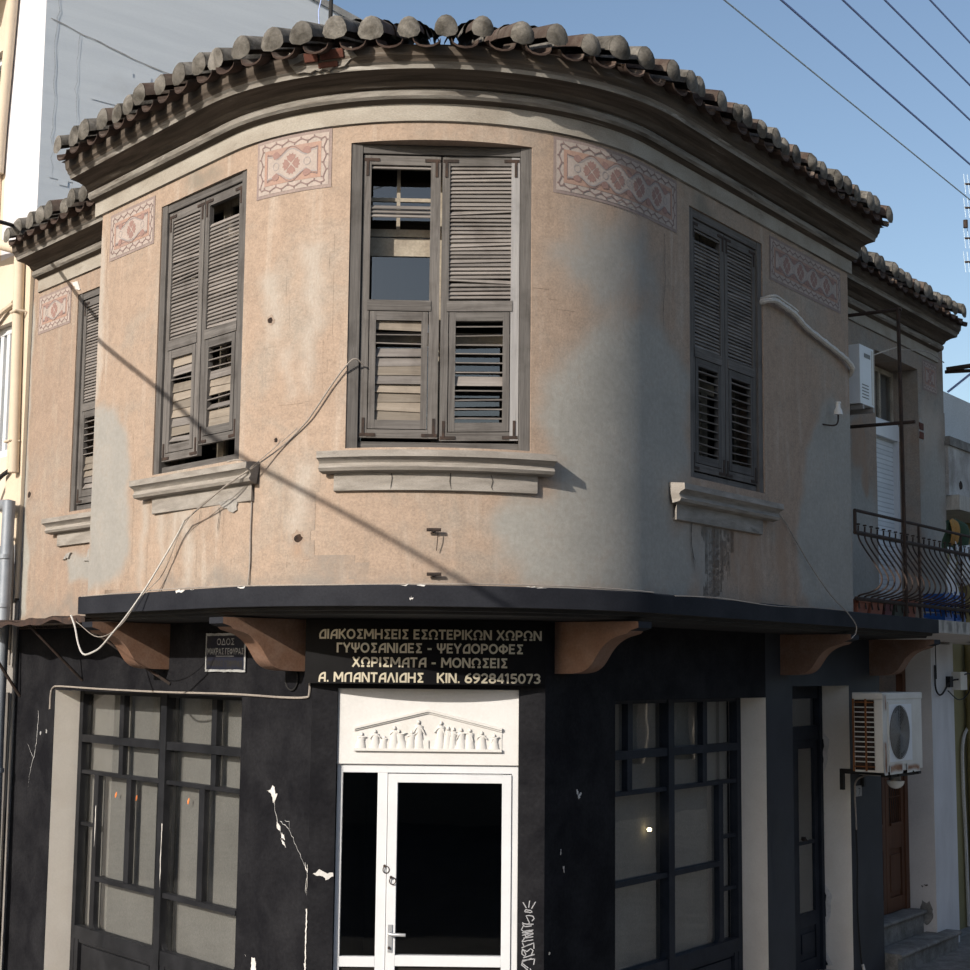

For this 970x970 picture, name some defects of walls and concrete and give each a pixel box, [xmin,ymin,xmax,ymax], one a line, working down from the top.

crack [50,0,170,176]
damp [701,525,760,603]